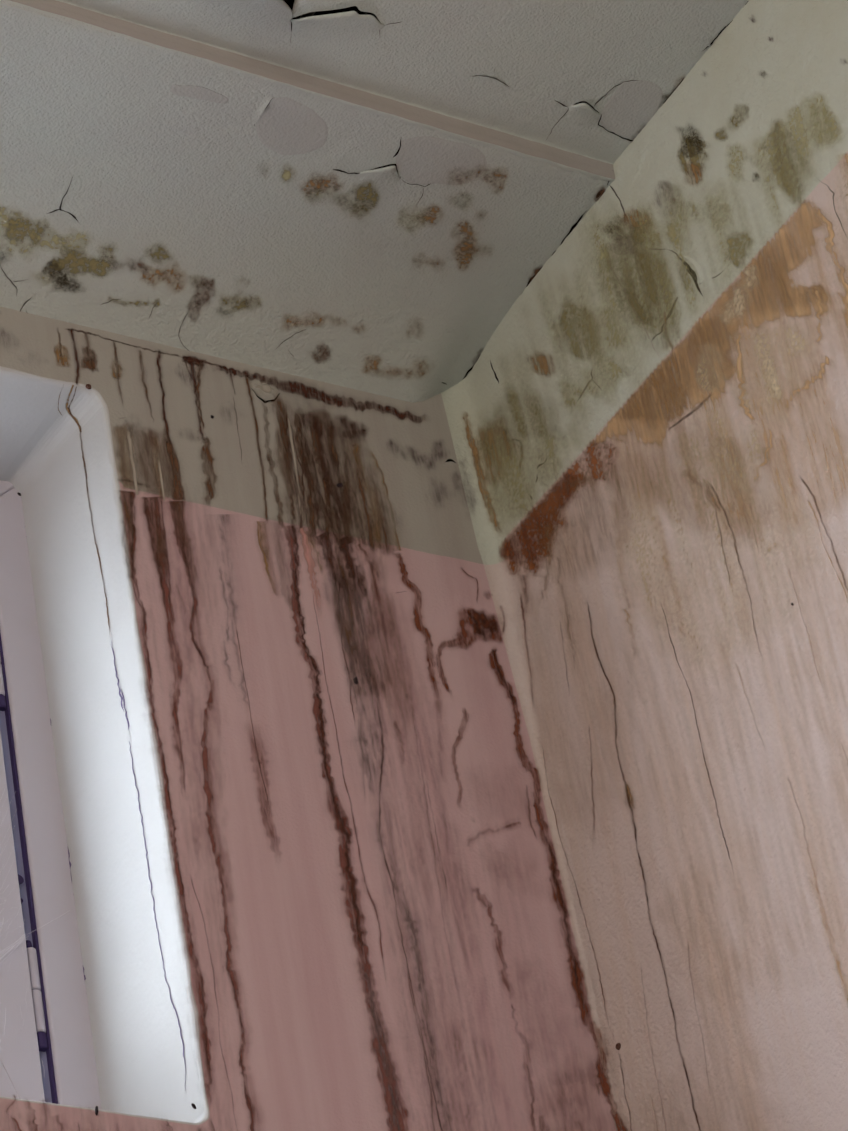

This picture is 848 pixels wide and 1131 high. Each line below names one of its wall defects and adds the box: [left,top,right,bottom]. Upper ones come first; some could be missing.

peeling [283,0,403,61]
water stain [0,207,113,289]
water stain [132,246,182,290]
water stain [189,280,260,311]
water stain [456,214,481,269]
water stain [560,205,697,358]
water stain [531,354,550,376]
water stain [593,97,848,594]
water stain [463,394,554,528]
corrosion [438,570,627,1131]